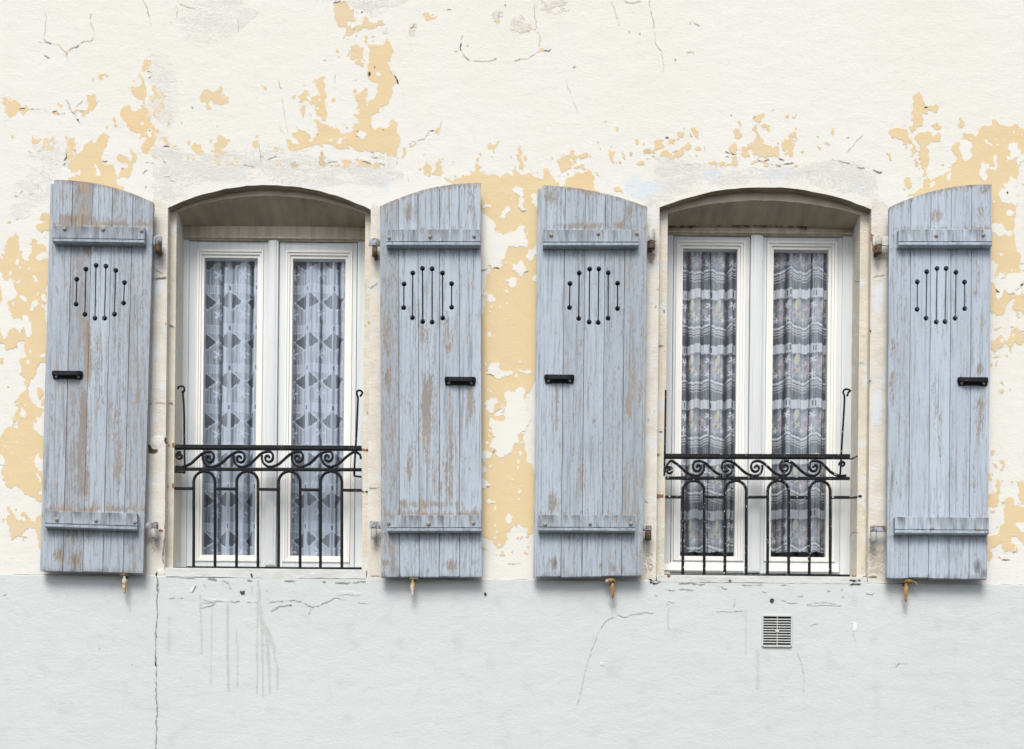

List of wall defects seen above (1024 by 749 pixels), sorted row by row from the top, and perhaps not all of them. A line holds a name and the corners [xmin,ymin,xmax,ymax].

crack [39,13,94,60]
peeling [32,59,240,192]
peeling [273,1,416,169]
peeling [889,92,1024,367]
peeling [0,212,50,502]
peeling [419,113,804,556]
peeling [2,506,41,548]
peeling [987,450,1024,561]
crack [154,499,253,749]
crack [577,562,877,703]